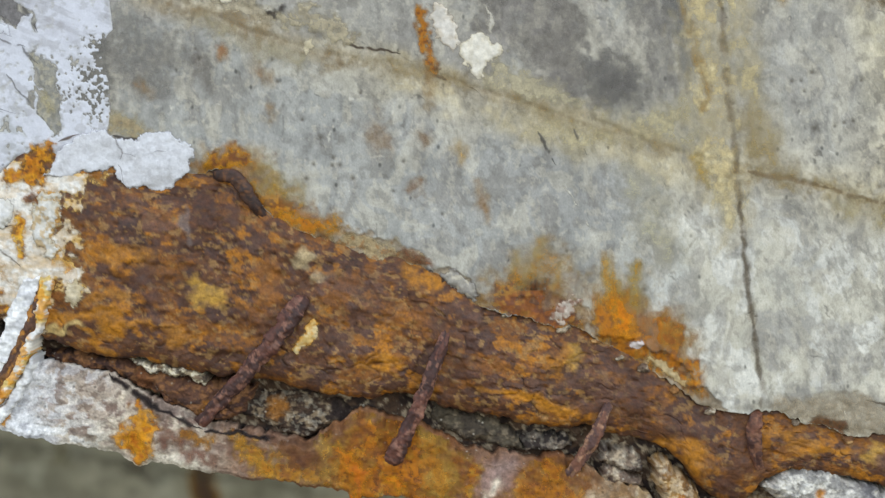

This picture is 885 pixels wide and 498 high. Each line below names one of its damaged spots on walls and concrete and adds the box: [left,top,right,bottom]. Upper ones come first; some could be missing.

crack [350,44,401,54]
rust [414,5,439,79]
crack [113,135,137,177]
peeling [0,39,194,337]
rust [0,290,9,320]
peeling [292,319,318,355]
rust [3,140,885,498]
spalling [40,330,236,416]
spalling [213,378,414,439]
spalling [422,400,592,457]
spalling [586,432,716,498]
spalling [747,468,885,498]